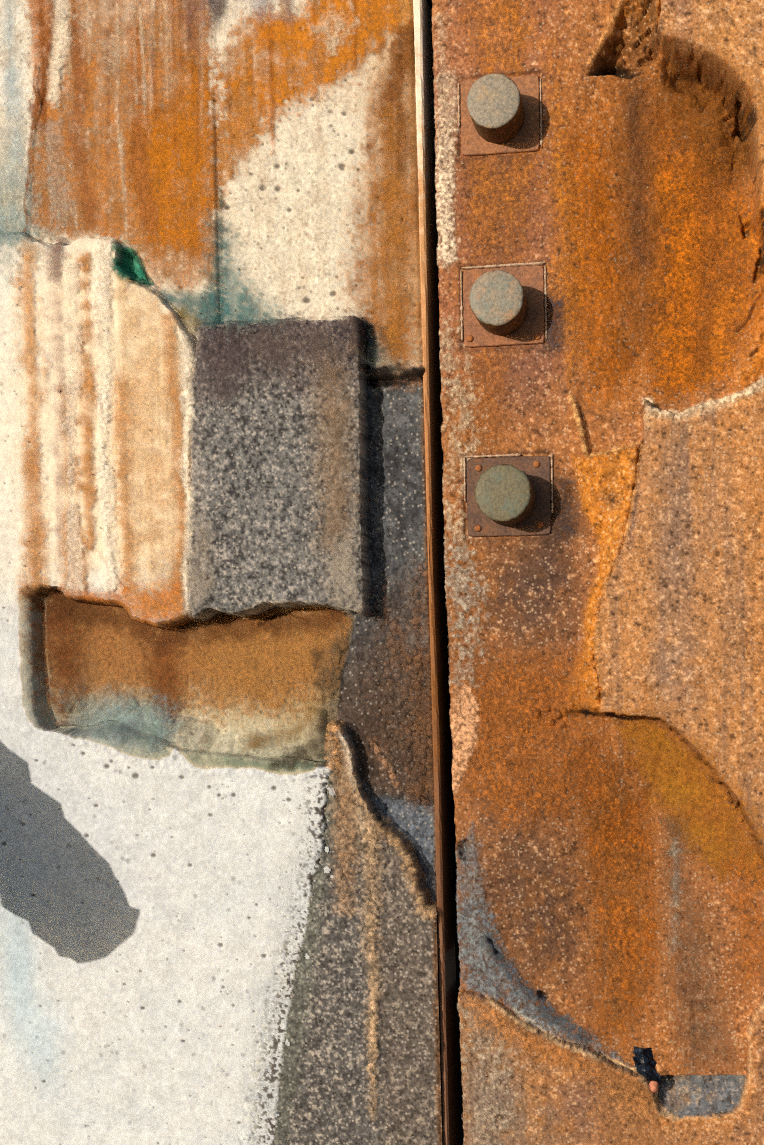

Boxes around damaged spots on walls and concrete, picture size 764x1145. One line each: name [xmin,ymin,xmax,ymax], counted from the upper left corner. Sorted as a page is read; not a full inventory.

corrosion [15,249,45,498]
corrosion [20,253,350,725]
corrosion [27,0,422,372]
spalling [17,375,442,1145]
peeling [440,393,457,895]
corrosion [459,153,539,264]
corrosion [467,0,534,76]
corrosion [466,996,654,1144]
spalling [459,715,764,1120]
corrosion [462,648,764,1038]
corrosion [551,104,764,410]
spalling [569,0,764,584]